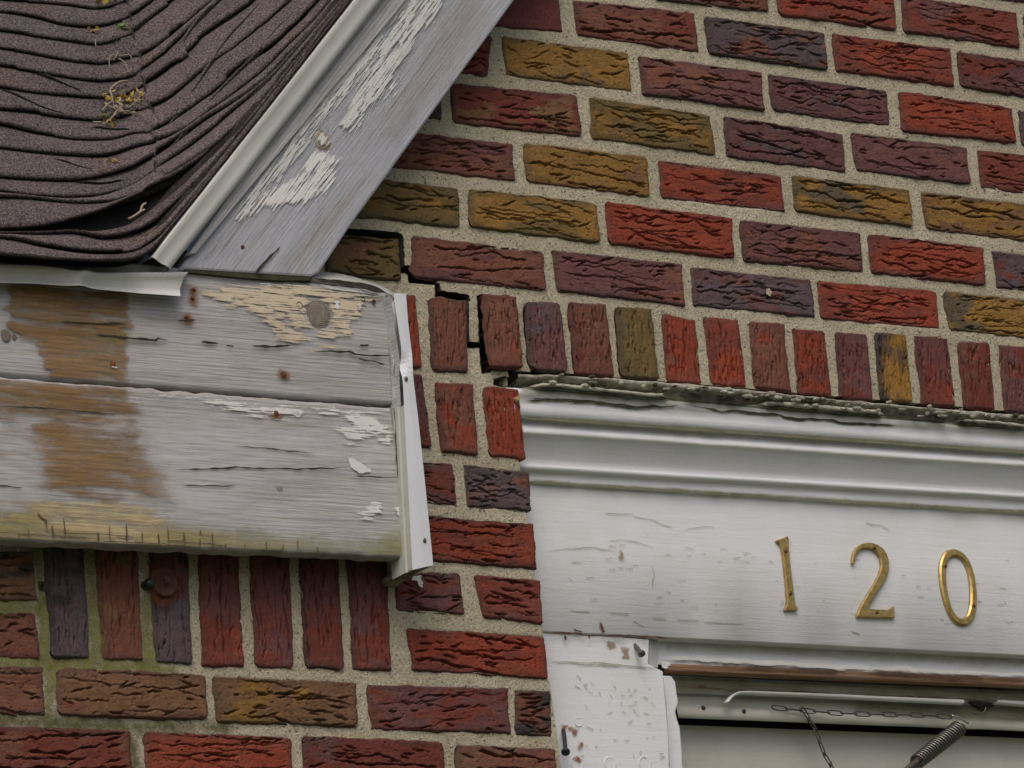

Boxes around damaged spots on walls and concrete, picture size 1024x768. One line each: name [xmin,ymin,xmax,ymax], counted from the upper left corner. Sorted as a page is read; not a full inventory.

peeling [232,0,443,222]
crack [62,319,291,348]
peeling [201,282,397,354]
crack [183,194,1024,430]
peeling [0,427,44,509]
damp [0,284,251,768]
peeling [132,391,394,515]
peeling [356,501,399,520]